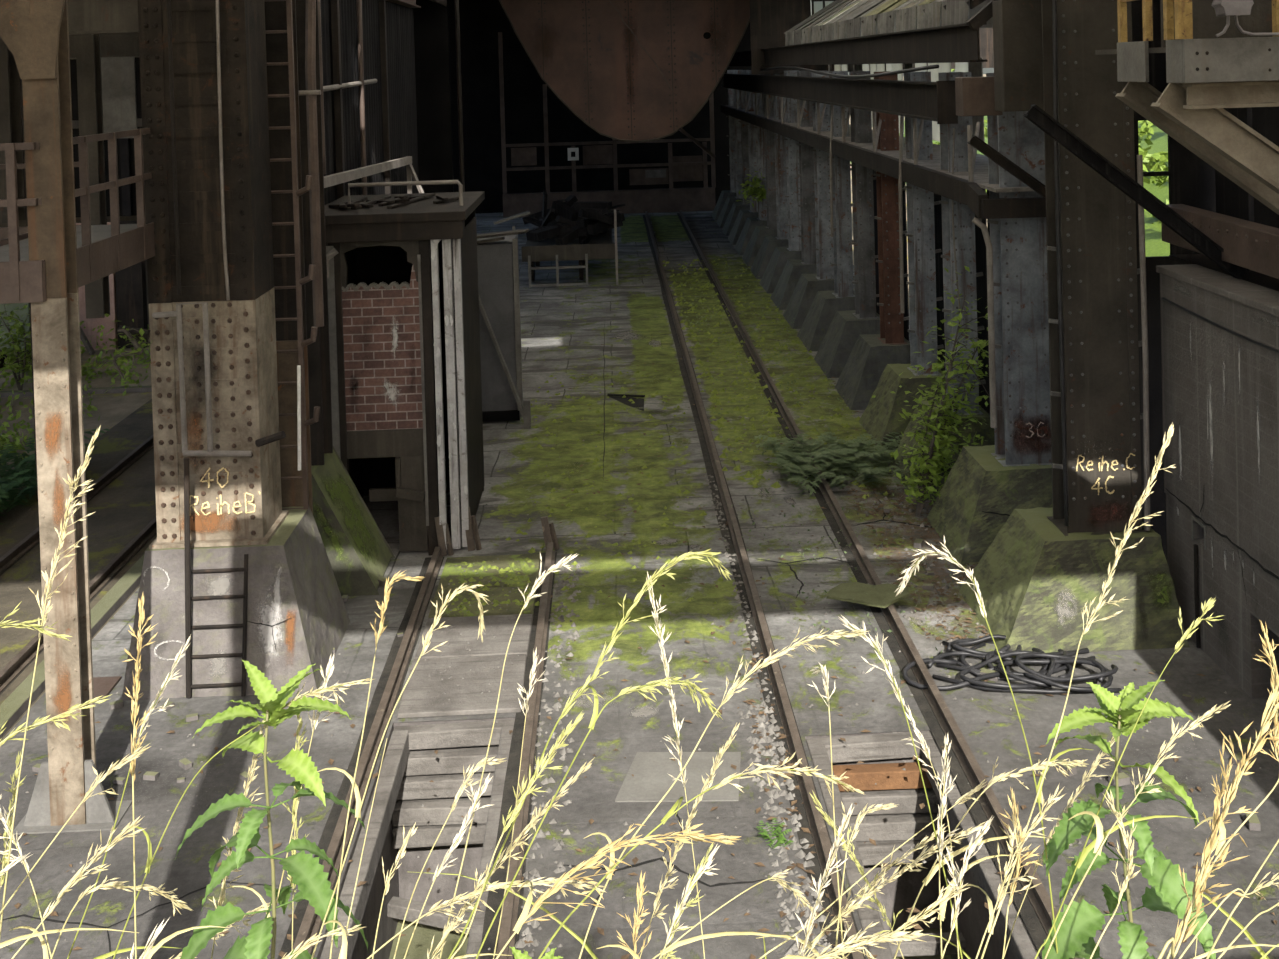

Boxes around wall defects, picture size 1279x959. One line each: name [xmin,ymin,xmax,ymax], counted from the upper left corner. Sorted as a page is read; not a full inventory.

water stain [1207,351,1240,460]
rust [45,415,61,454]
rust [1013,415,1051,454]
rust [54,478,64,523]
crack [1167,490,1279,604]
rust [285,613,295,650]
rust [54,674,71,718]